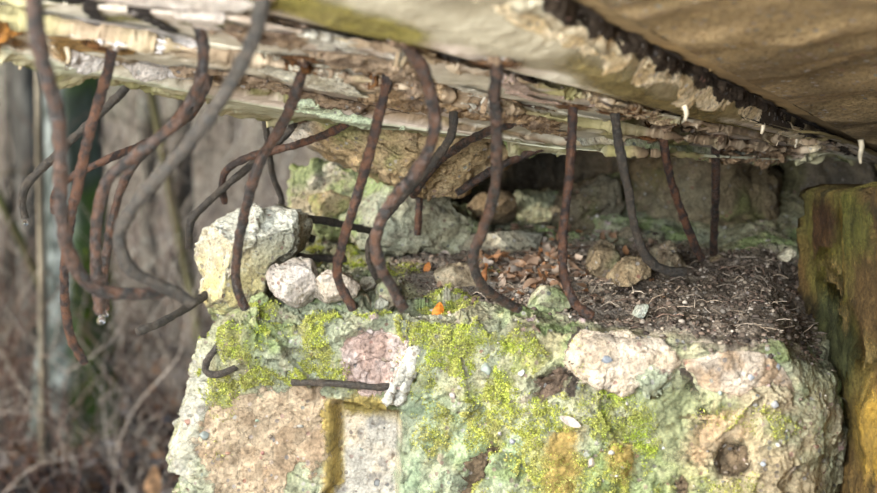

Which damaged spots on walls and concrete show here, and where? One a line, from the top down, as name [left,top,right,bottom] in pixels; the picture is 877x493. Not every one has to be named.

rust [0,21,27,50]
rust [49,36,107,60]
rust [274,55,323,77]
rust [363,71,387,90]
rust [469,59,521,68]
rust [547,99,657,142]
spalling [18,0,797,402]
leakage [826,261,849,328]
leakage [863,338,877,368]
leakage [169,367,209,479]
leakage [394,388,441,493]
leakage [649,383,706,469]